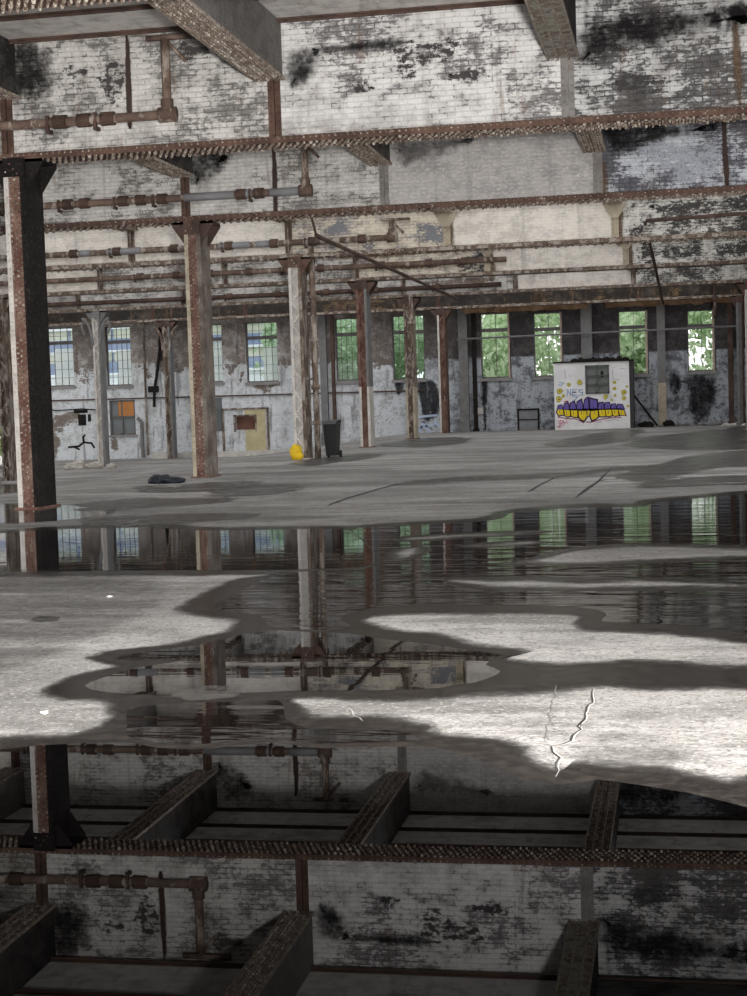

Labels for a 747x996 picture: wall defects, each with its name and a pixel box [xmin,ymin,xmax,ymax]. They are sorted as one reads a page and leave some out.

spalling [53,411,80,458]
crack [539,684,595,776]